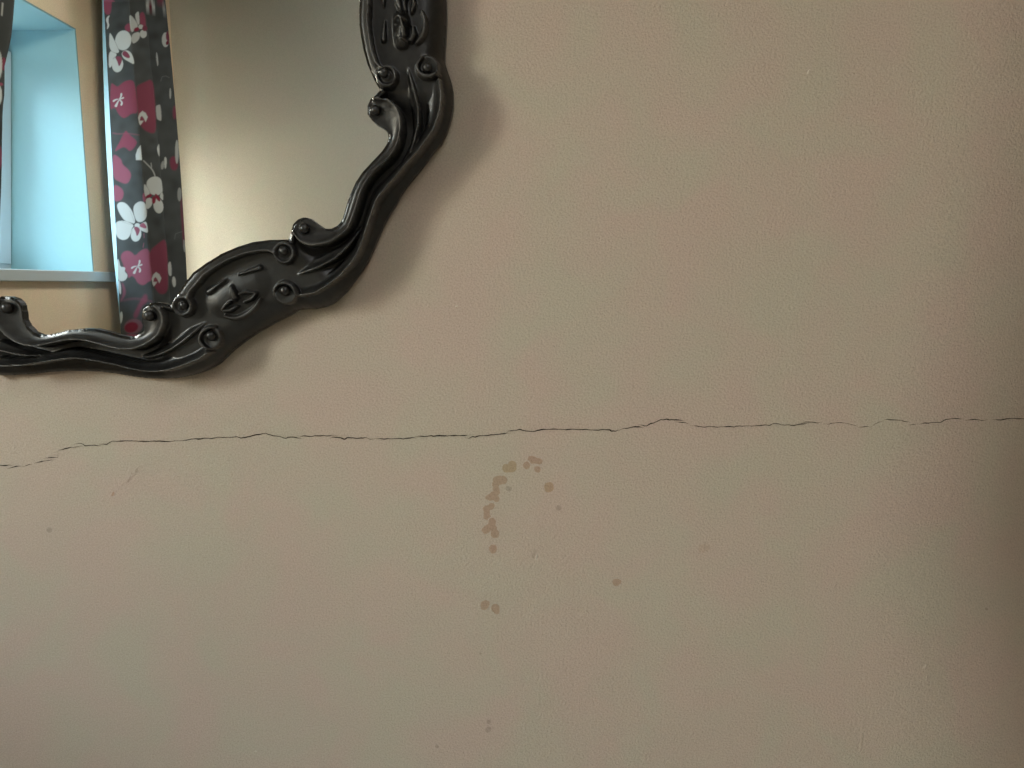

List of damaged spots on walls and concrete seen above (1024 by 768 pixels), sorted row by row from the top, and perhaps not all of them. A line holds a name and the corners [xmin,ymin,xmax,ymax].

crack [0,418,1023,469]
damp [481,455,555,555]